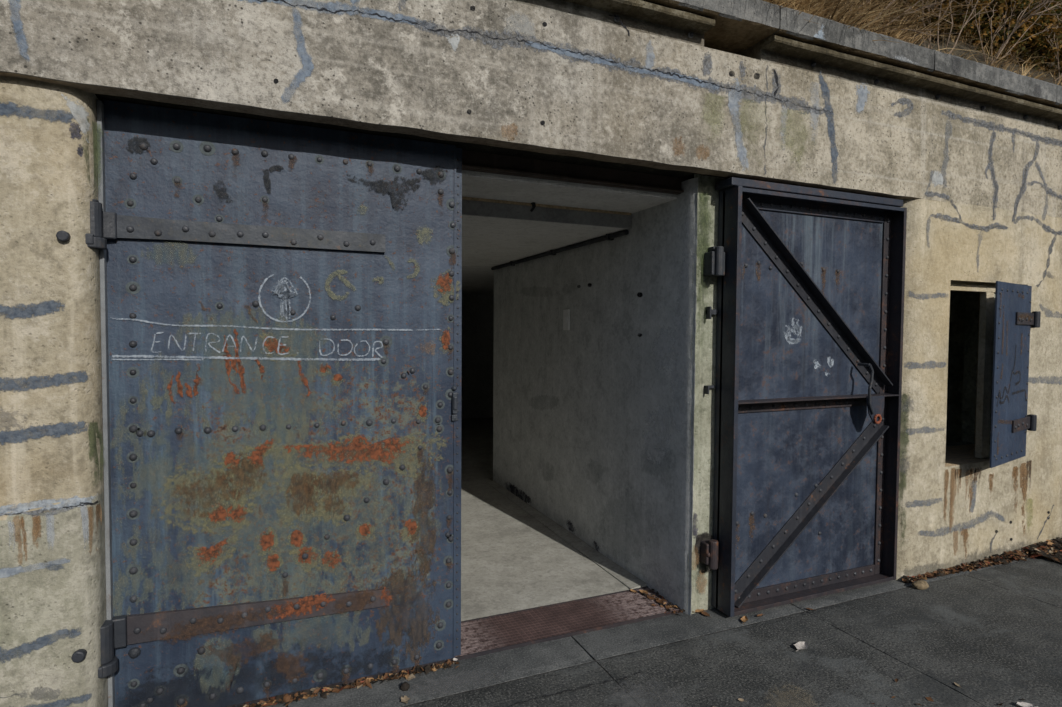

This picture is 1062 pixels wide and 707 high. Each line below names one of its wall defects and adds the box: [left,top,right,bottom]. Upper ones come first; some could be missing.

crack [0,102,76,124]
crack [238,0,839,182]
crack [925,110,1062,318]
crack [0,371,88,392]
rust [167,367,201,404]
rust [223,329,265,394]
rust [263,336,289,354]
crack [0,421,87,445]
rust [944,468,994,529]
rust [1012,460,1032,508]
rust [160,435,439,683]
crack [0,629,81,663]